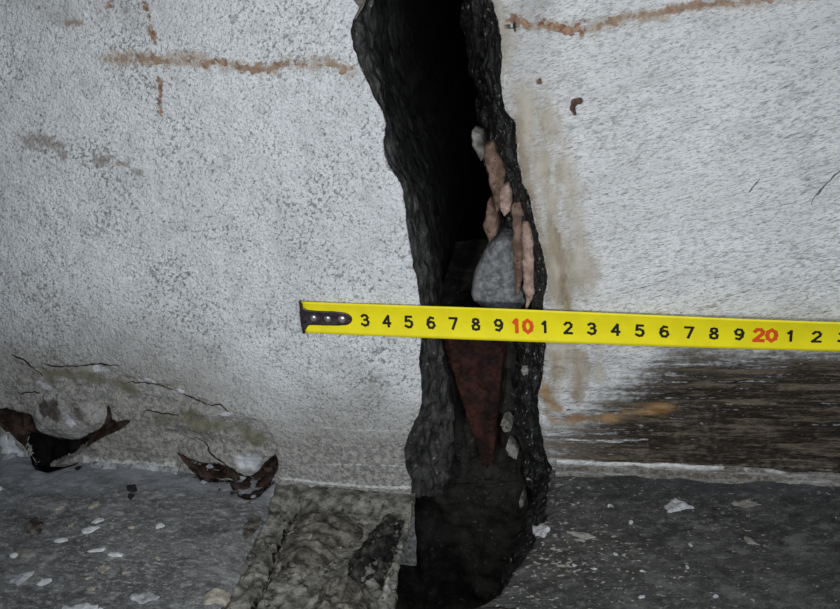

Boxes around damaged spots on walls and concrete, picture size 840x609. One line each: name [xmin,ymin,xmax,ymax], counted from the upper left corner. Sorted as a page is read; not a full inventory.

corrosion [104,54,170,65]
corrosion [142,2,157,44]
corrosion [186,55,304,75]
corrosion [505,0,773,37]
crack [351,0,547,310]
damp [515,89,534,208]
damp [538,223,595,311]
damp [544,343,587,408]
flaking render [0,406,129,473]
crack [395,338,553,609]
crack [251,507,301,609]
spalling [176,437,415,609]